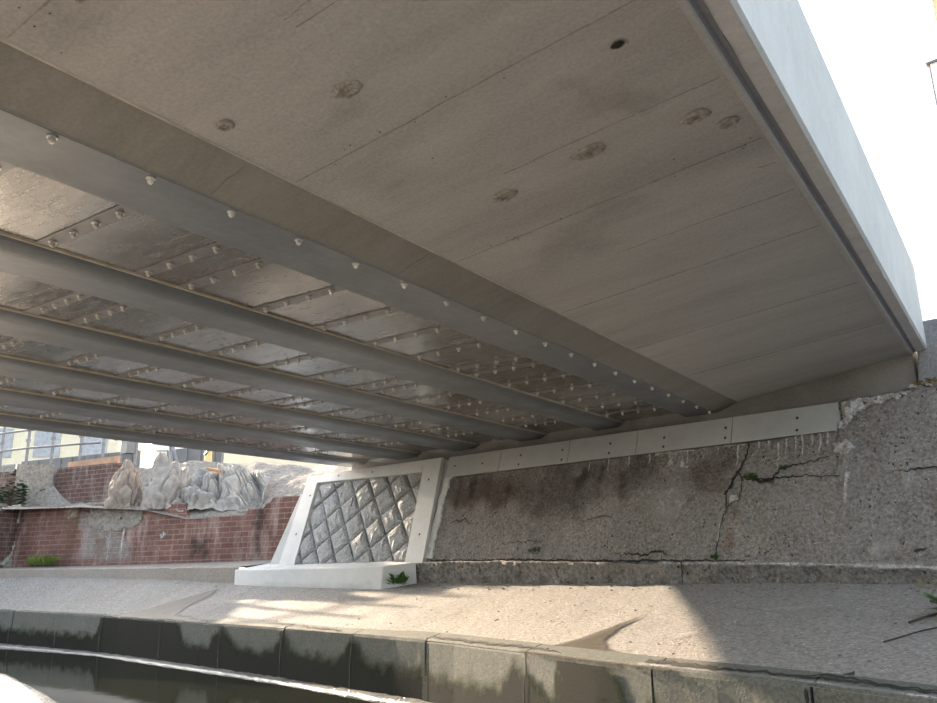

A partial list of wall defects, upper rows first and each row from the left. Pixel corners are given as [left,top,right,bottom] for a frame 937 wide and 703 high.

spalling [332,80,364,99]
spalling [569,142,607,160]
spalling [837,390,911,429]
spalling [833,439,857,455]
crack [899,465,937,473]
crack [430,442,840,584]